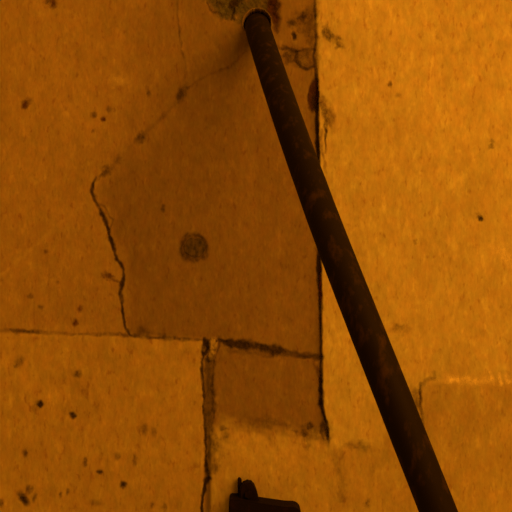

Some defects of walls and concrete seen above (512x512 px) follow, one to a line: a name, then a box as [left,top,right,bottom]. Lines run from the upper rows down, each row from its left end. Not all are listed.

crack [90,170,130,335]